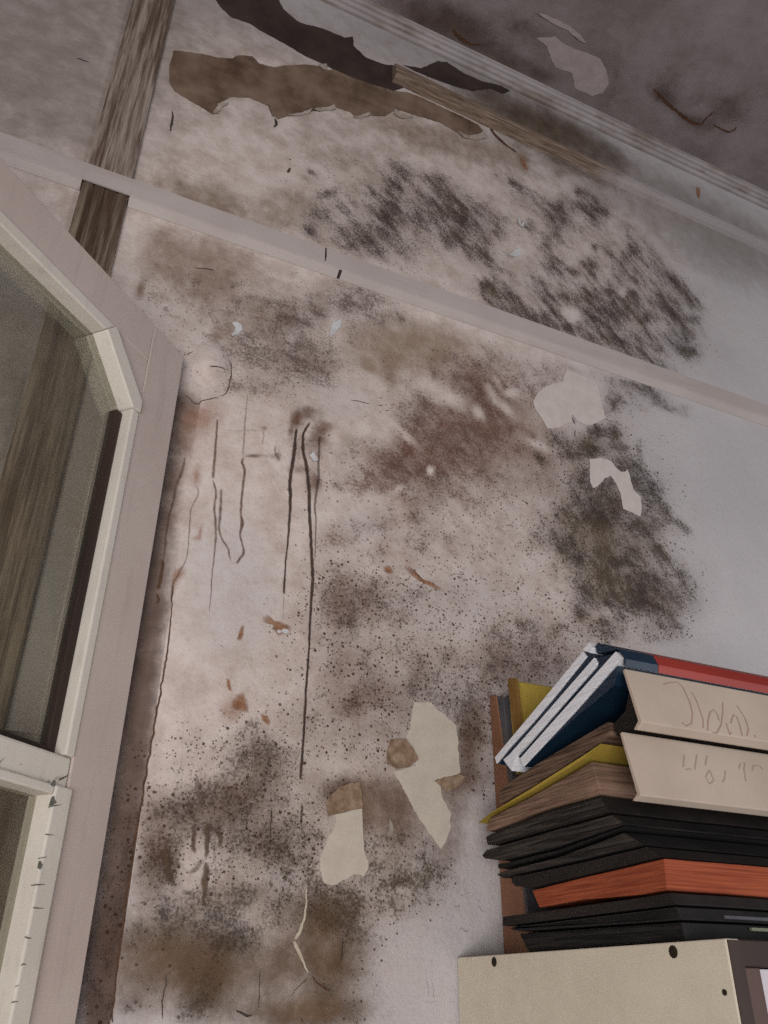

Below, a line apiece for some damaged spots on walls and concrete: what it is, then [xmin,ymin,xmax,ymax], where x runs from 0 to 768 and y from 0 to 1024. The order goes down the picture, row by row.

peeling [169,0,510,140]
peeling [536,13,609,96]
damp [304,162,703,367]
crack [186,351,232,405]
peeling [533,370,605,429]
peeling [589,458,642,517]
damp [83,283,707,1024]
crack [111,587,173,1022]
peeling [320,782,369,885]
peeling [387,702,465,849]